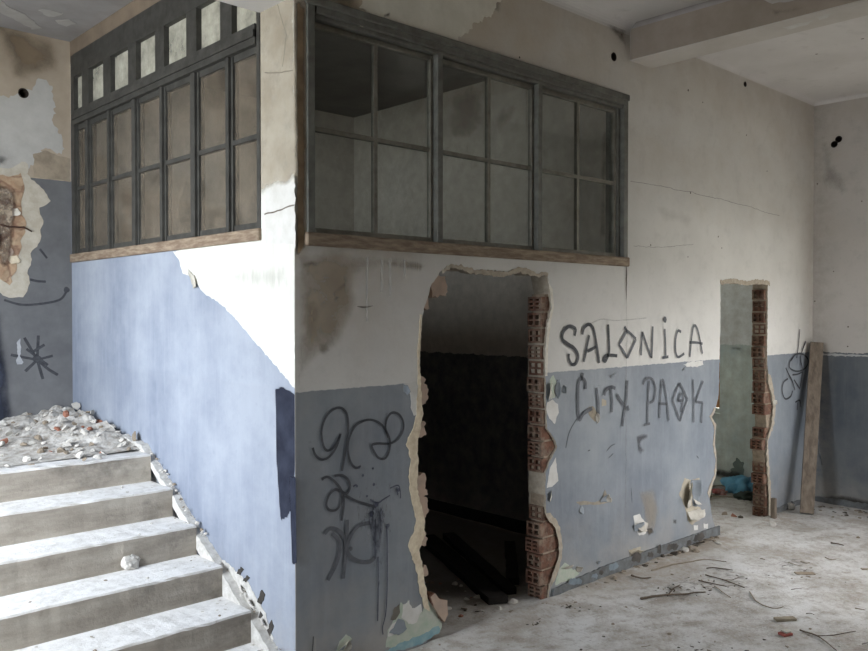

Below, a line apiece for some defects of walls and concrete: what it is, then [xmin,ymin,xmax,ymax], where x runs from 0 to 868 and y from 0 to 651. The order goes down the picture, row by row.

water stain [6,33,51,69]
water stain [70,0,160,56]
peeling [359,0,501,41]
spalling [0,78,70,298]
flaking render [386,264,584,651]
peeling [629,407,717,563]